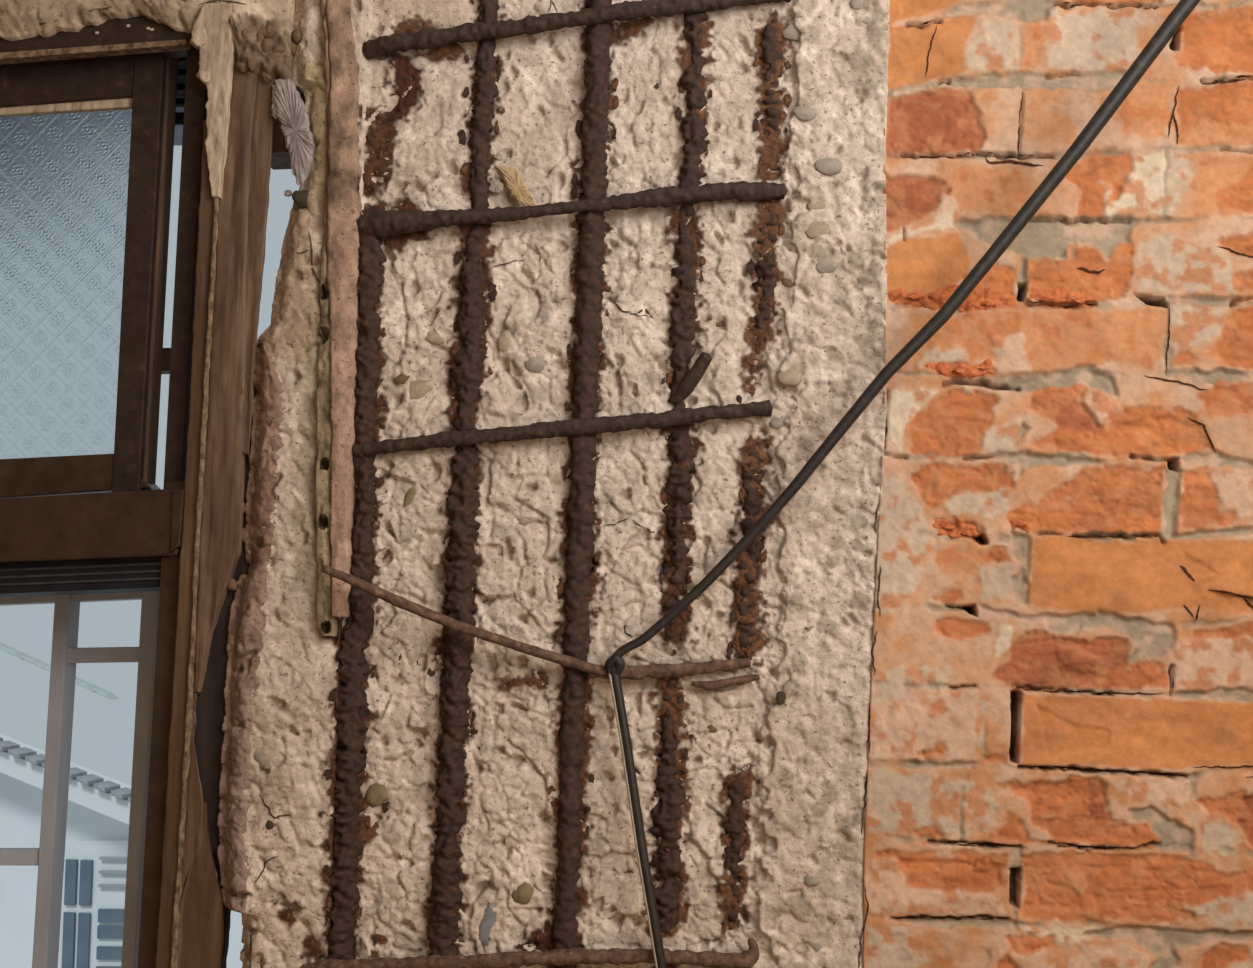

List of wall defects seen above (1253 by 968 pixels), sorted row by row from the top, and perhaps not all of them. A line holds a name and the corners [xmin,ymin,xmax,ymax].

rust [357,39,509,211]
rust [753,11,793,182]
crack [918,20,937,73]
crack [1168,75,1253,144]
rust [444,222,497,425]
crack [1217,246,1253,258]
spalling [217,341,286,914]
spalling [325,0,810,968]
rust [655,424,705,655]
rust [726,435,780,667]
crack [1180,565,1253,620]
crack [1019,765,1253,777]